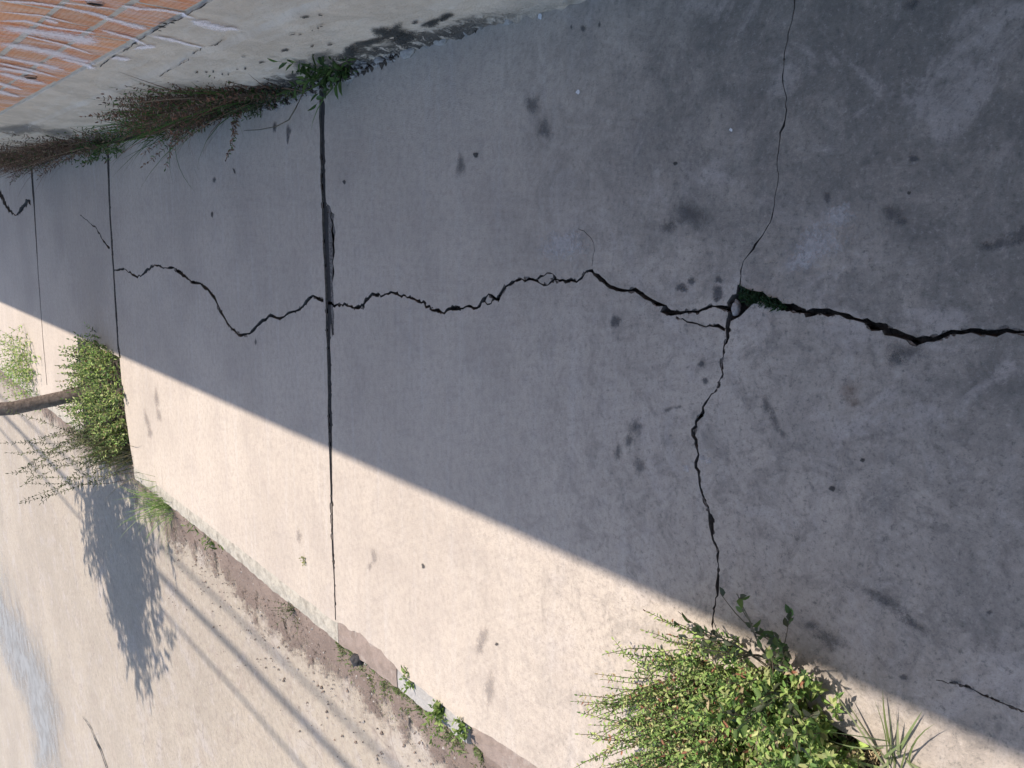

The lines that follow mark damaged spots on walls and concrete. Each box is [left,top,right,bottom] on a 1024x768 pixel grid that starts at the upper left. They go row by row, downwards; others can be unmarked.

crack [0,191,31,216]
crack [80,0,1024,659]
crack [937,680,1024,713]